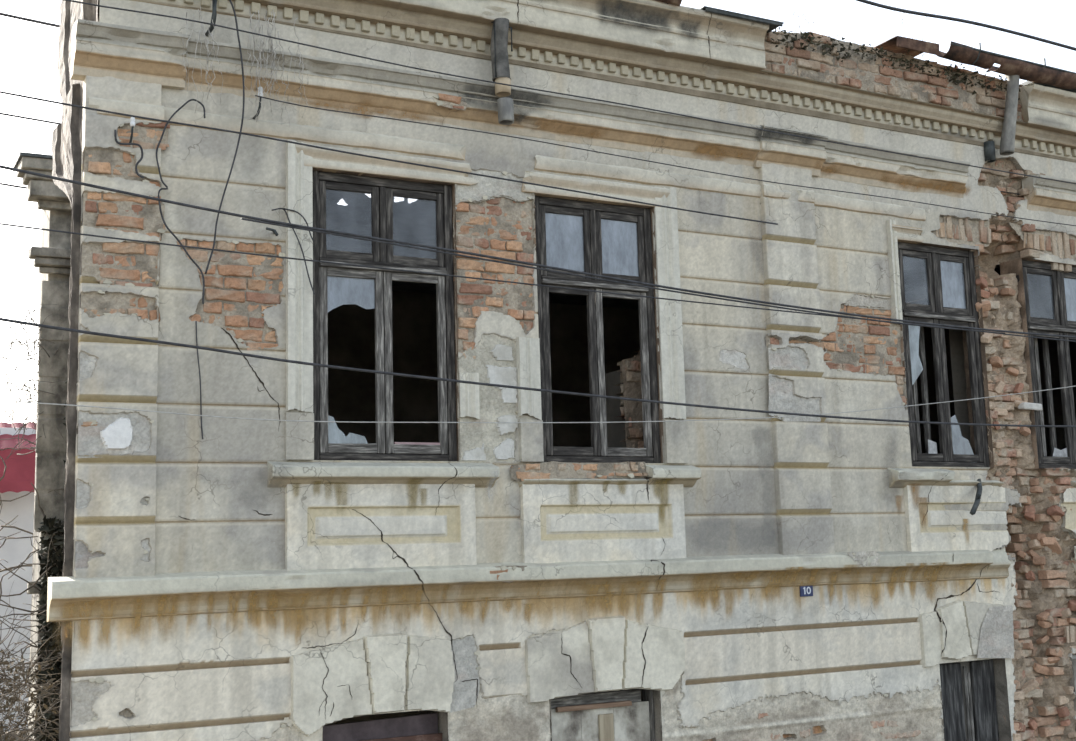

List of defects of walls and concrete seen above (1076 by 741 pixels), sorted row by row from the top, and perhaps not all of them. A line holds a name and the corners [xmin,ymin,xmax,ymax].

flaking render [760,31,1024,121]
spalling [80,121,286,351]
peeling [79,351,98,380]
spalling [452,170,536,465]
spalling [765,294,906,422]
peeling [78,411,154,458]
crack [307,621,359,720]
crack [352,509,478,704]
crack [640,628,648,688]
spalling [660,673,943,741]
peeling [977,605,1014,658]